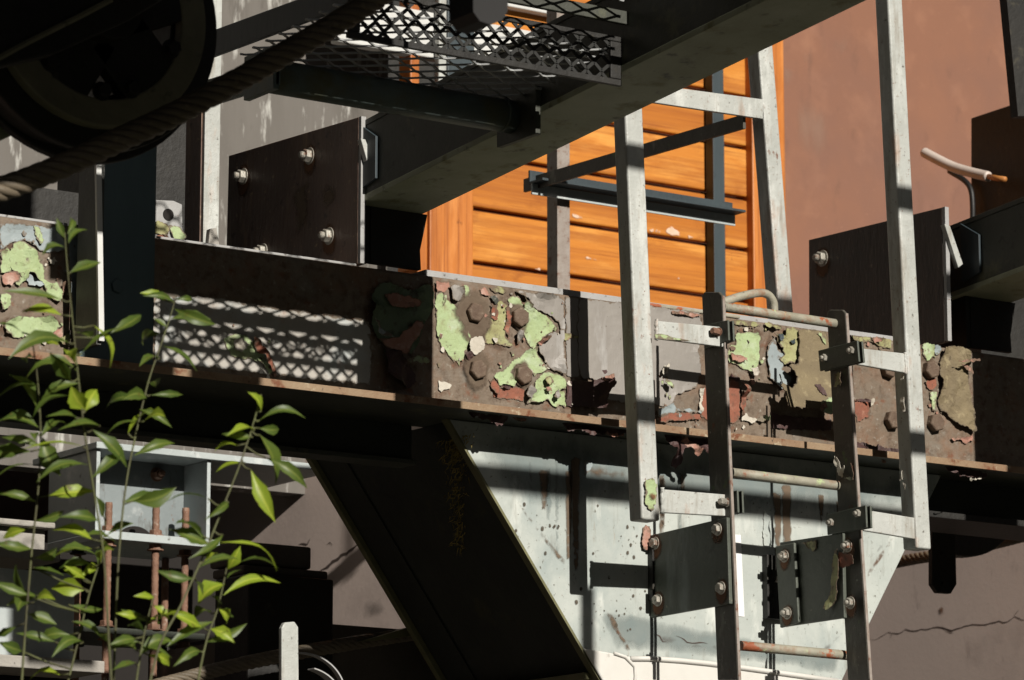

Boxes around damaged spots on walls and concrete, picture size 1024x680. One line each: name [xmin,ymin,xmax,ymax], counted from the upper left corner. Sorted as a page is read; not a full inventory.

peeling [0,223,78,347]
peeling [153,281,625,412]
peeling [852,335,892,350]
peeling [922,343,942,362]
peeling [650,305,708,470]
peeling [726,319,800,430]
peeling [925,378,942,414]
peeling [833,456,854,480]
peeling [857,442,899,463]
crack [871,610,1022,640]